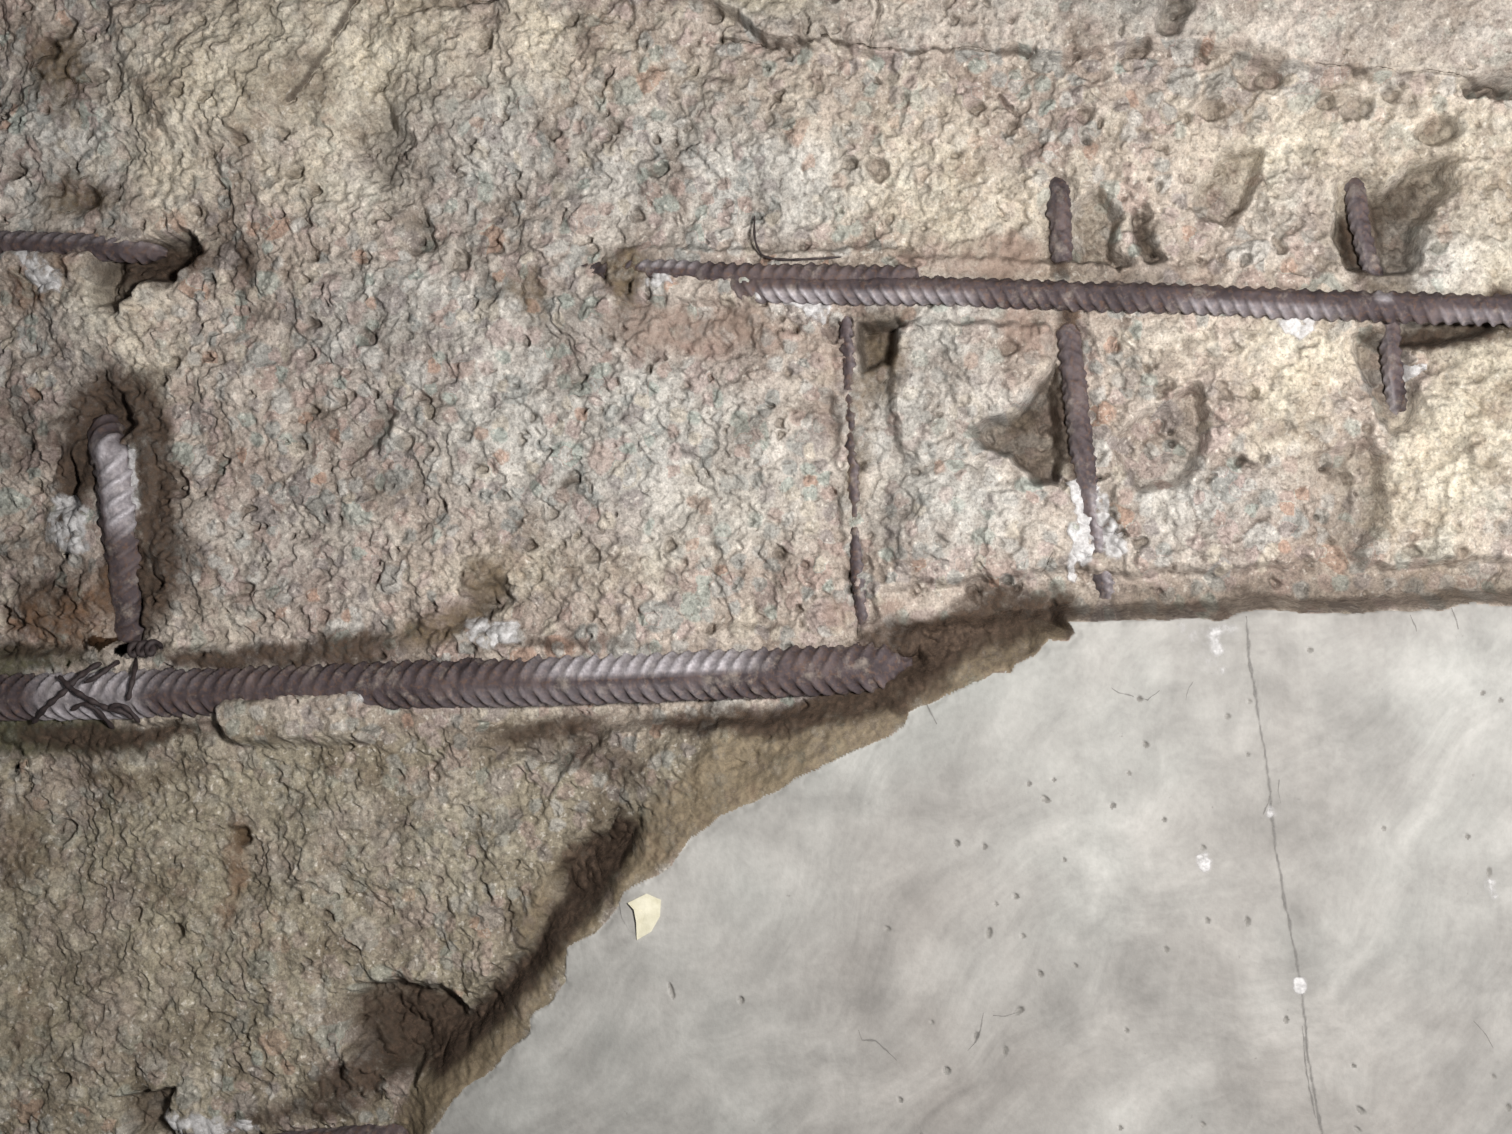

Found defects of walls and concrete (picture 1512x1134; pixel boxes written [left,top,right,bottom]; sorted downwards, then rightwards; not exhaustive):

crack [287,0,356,102]
corrosion [1340,219,1366,272]
spalling [0,0,1512,722]
corrosion [1399,323,1510,351]
corrosion [55,370,184,634]
corrosion [0,563,115,677]
corrosion [166,631,388,670]
corrosion [0,719,198,755]
spalling [0,642,912,1134]
spalling [1197,854,1211,872]
crack [1246,616,1322,1130]
spalling [1294,977,1306,994]